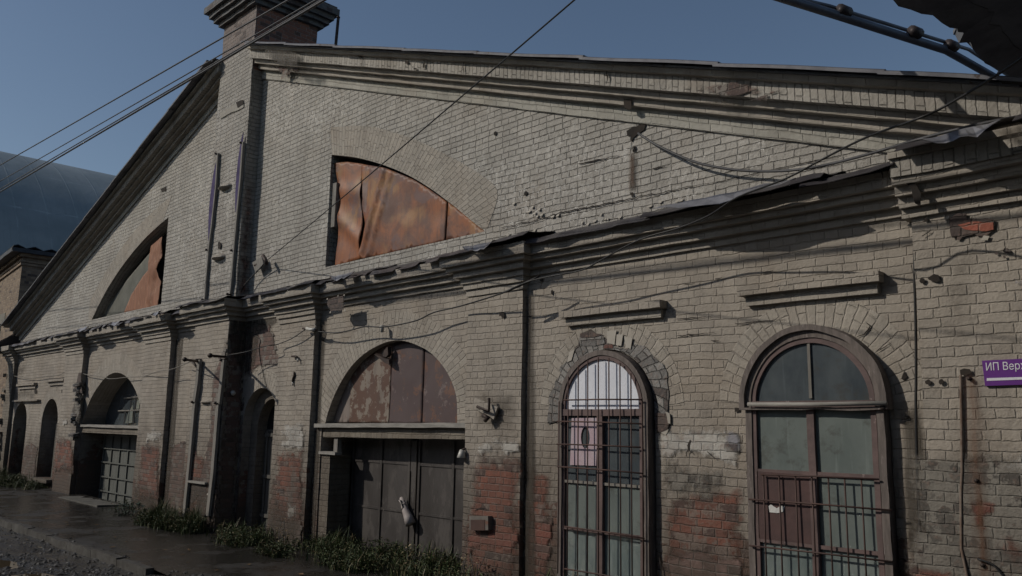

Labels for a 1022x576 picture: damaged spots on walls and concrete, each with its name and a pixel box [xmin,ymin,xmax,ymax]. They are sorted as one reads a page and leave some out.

spalling [943,213,995,240]
peeling [138,322,278,527]
peeling [466,457,520,576]
peeling [530,474,552,576]
spalling [664,550,741,576]
peeling [910,454,1022,576]